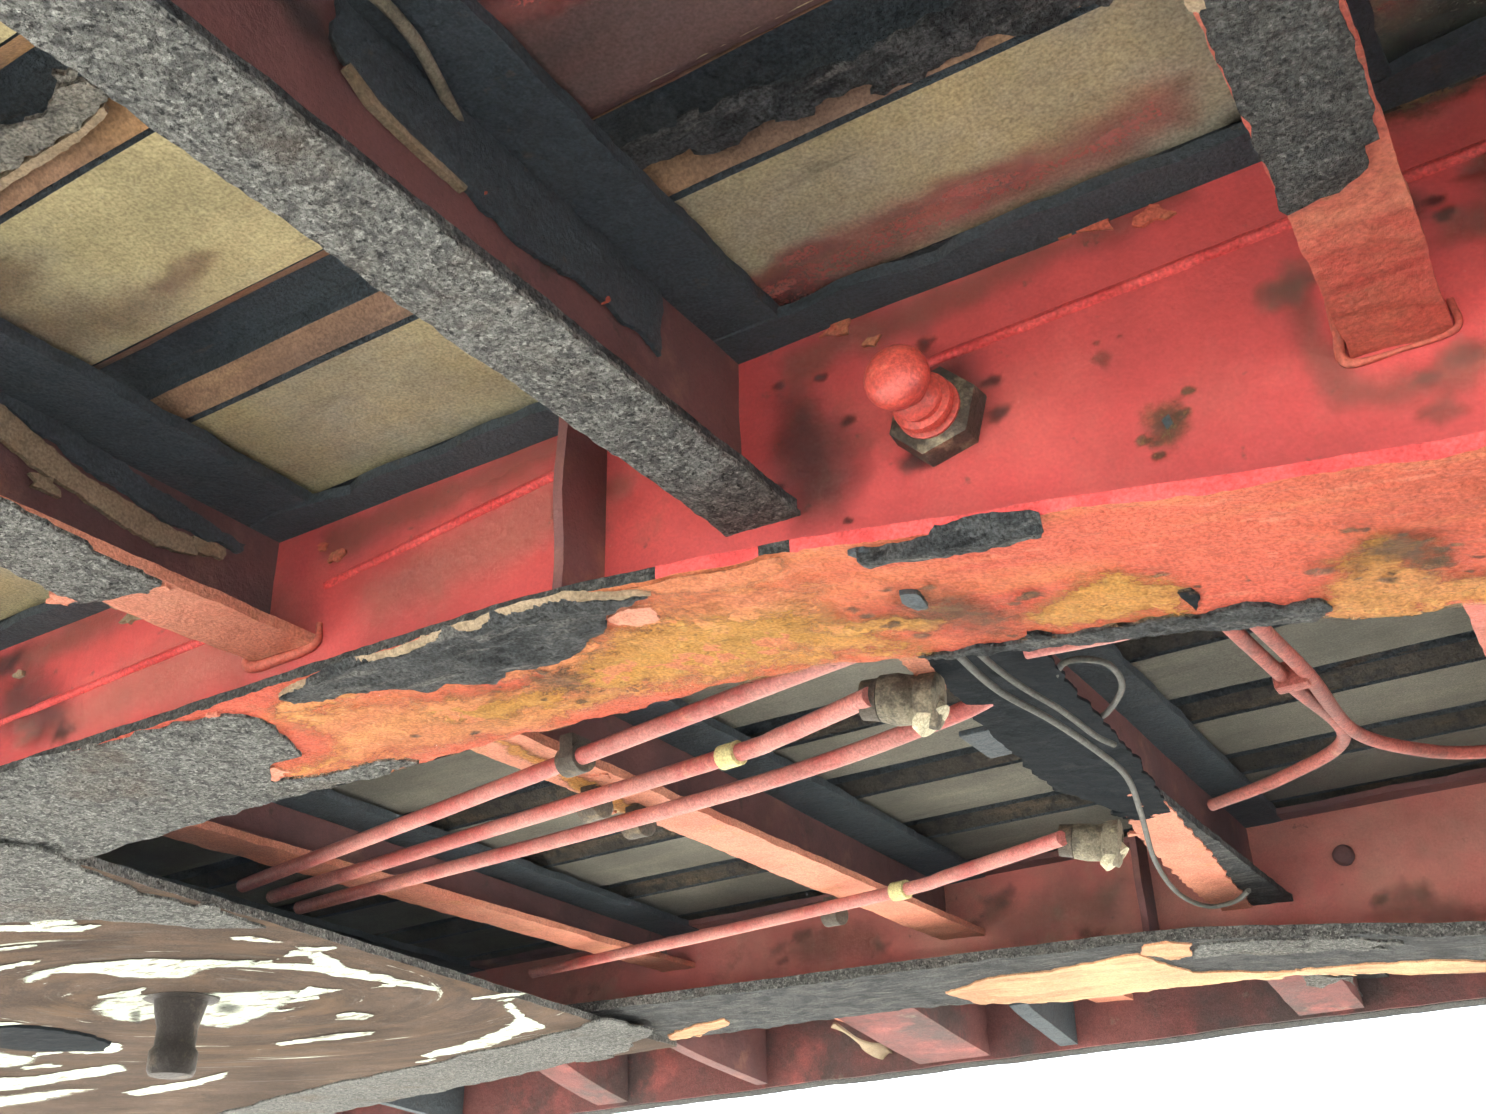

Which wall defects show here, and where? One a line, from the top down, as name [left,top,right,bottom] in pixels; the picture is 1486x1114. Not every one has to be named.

peeling [1184,0,1206,13]
peeling [690,133,747,155]
peeling [286,0,664,357]
rust [0,0,801,537]
rust [0,496,171,606]
peeling [847,546,869,558]
spalling [278,589,660,704]
rust [0,527,1486,929]
peeling [945,941,1486,1005]
rust [1193,934,1404,959]
rust [1301,974,1363,997]